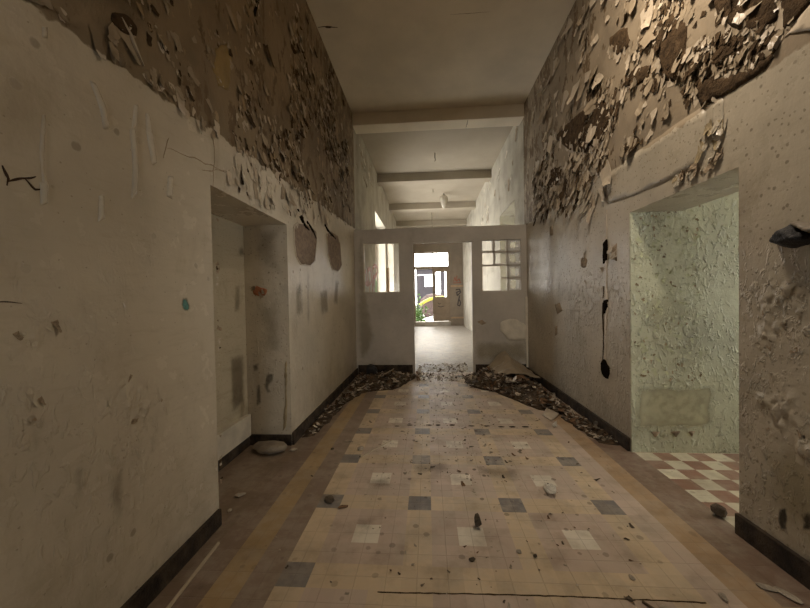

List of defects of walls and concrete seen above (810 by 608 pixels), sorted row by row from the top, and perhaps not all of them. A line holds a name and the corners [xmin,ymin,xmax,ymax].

peeling [88,0,220,140]
peeling [216,0,353,272]
peeling [531,0,810,235]
crack [601,210,613,379]
flaking render [600,243,619,261]